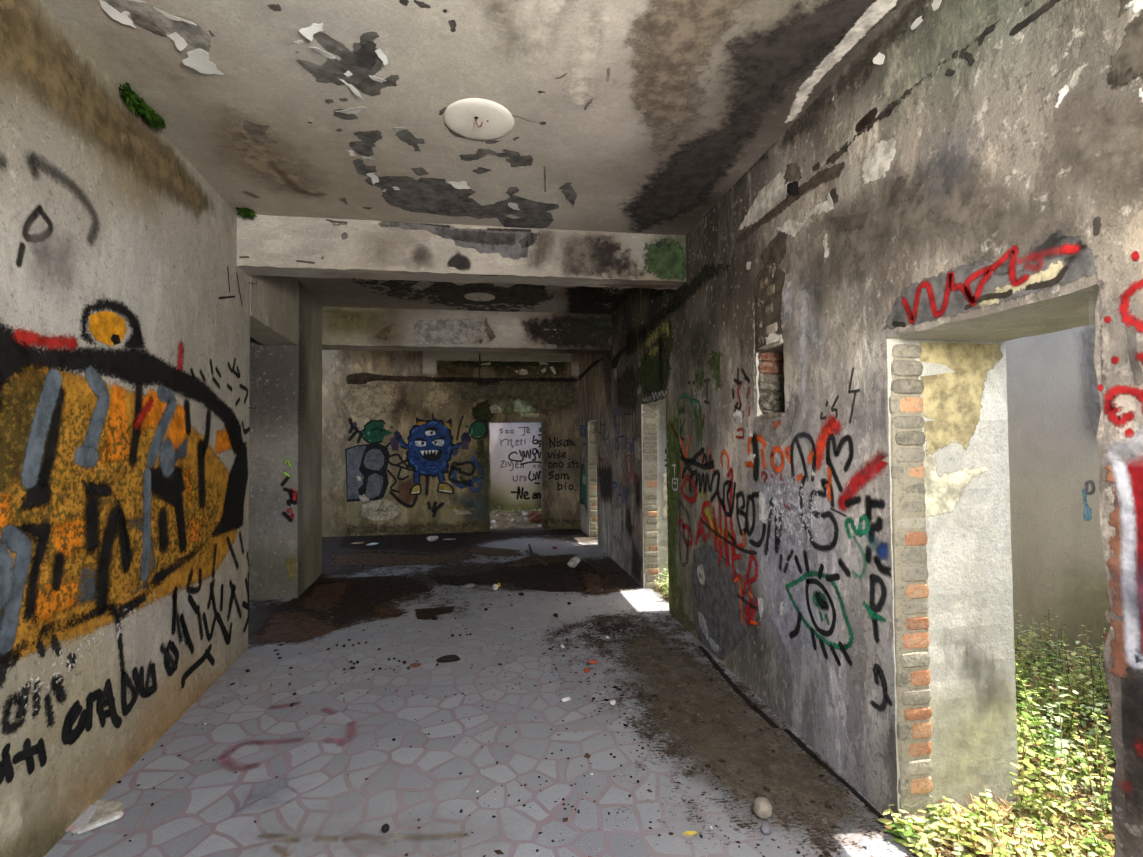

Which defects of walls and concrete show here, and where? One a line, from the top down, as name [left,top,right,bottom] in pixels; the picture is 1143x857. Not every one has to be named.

peeling [100,0,224,75]
peeling [294,23,577,259]
peeling [353,278,556,312]
damp [642,261,731,334]
damp [623,0,942,232]
flaking render [733,187,838,447]
flaking render [739,147,848,230]
damp [736,35,981,244]
flaking render [862,136,896,187]
damp [782,165,1077,392]
damp [1072,118,1143,184]
flaking render [1106,460,1129,677]